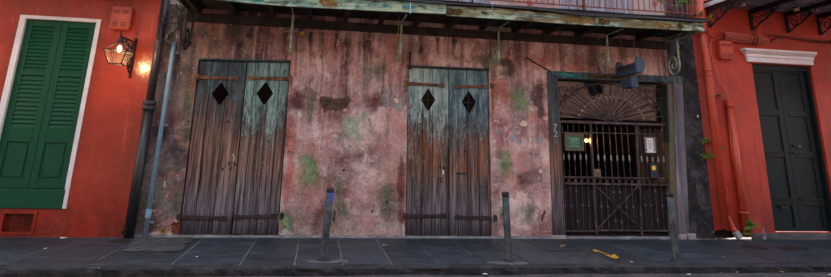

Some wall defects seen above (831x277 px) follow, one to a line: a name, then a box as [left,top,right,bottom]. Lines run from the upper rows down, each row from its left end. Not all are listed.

spalling [317,93,351,112]